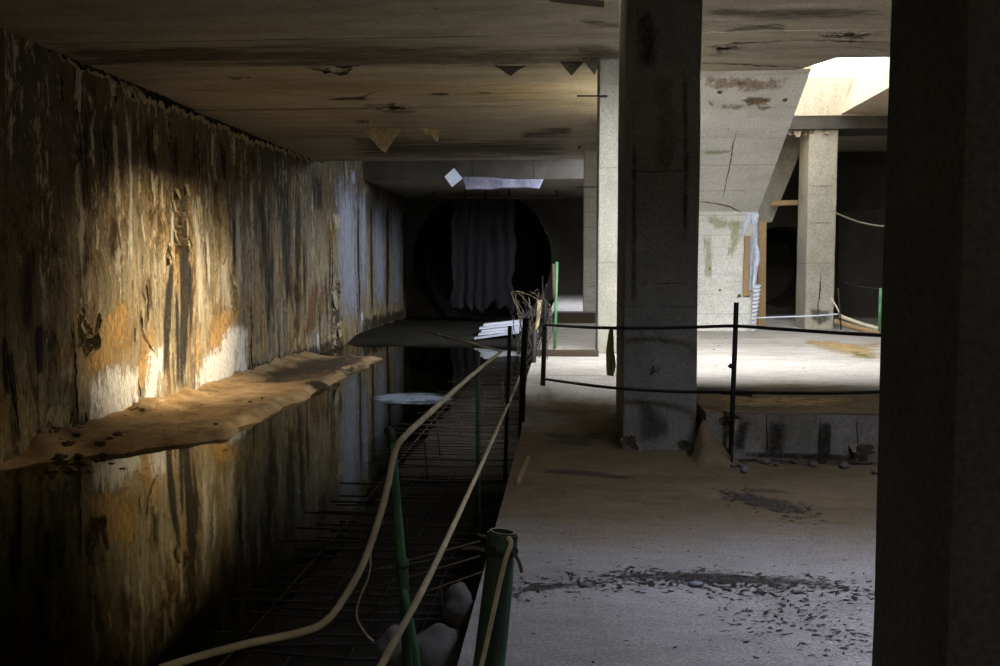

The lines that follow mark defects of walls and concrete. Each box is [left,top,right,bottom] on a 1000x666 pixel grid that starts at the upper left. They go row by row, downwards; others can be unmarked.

damp [79,46,618,66]
corrosion [708,77,777,110]
damp [714,9,861,32]
crack [699,131,742,212]
spalling [165,184,192,266]
damp [37,108,363,434]
damp [325,171,406,331]
damp [711,218,738,253]
spalling [78,307,103,357]
corrosion [83,300,129,376]
corrosion [138,330,155,387]
corrosion [188,294,265,382]